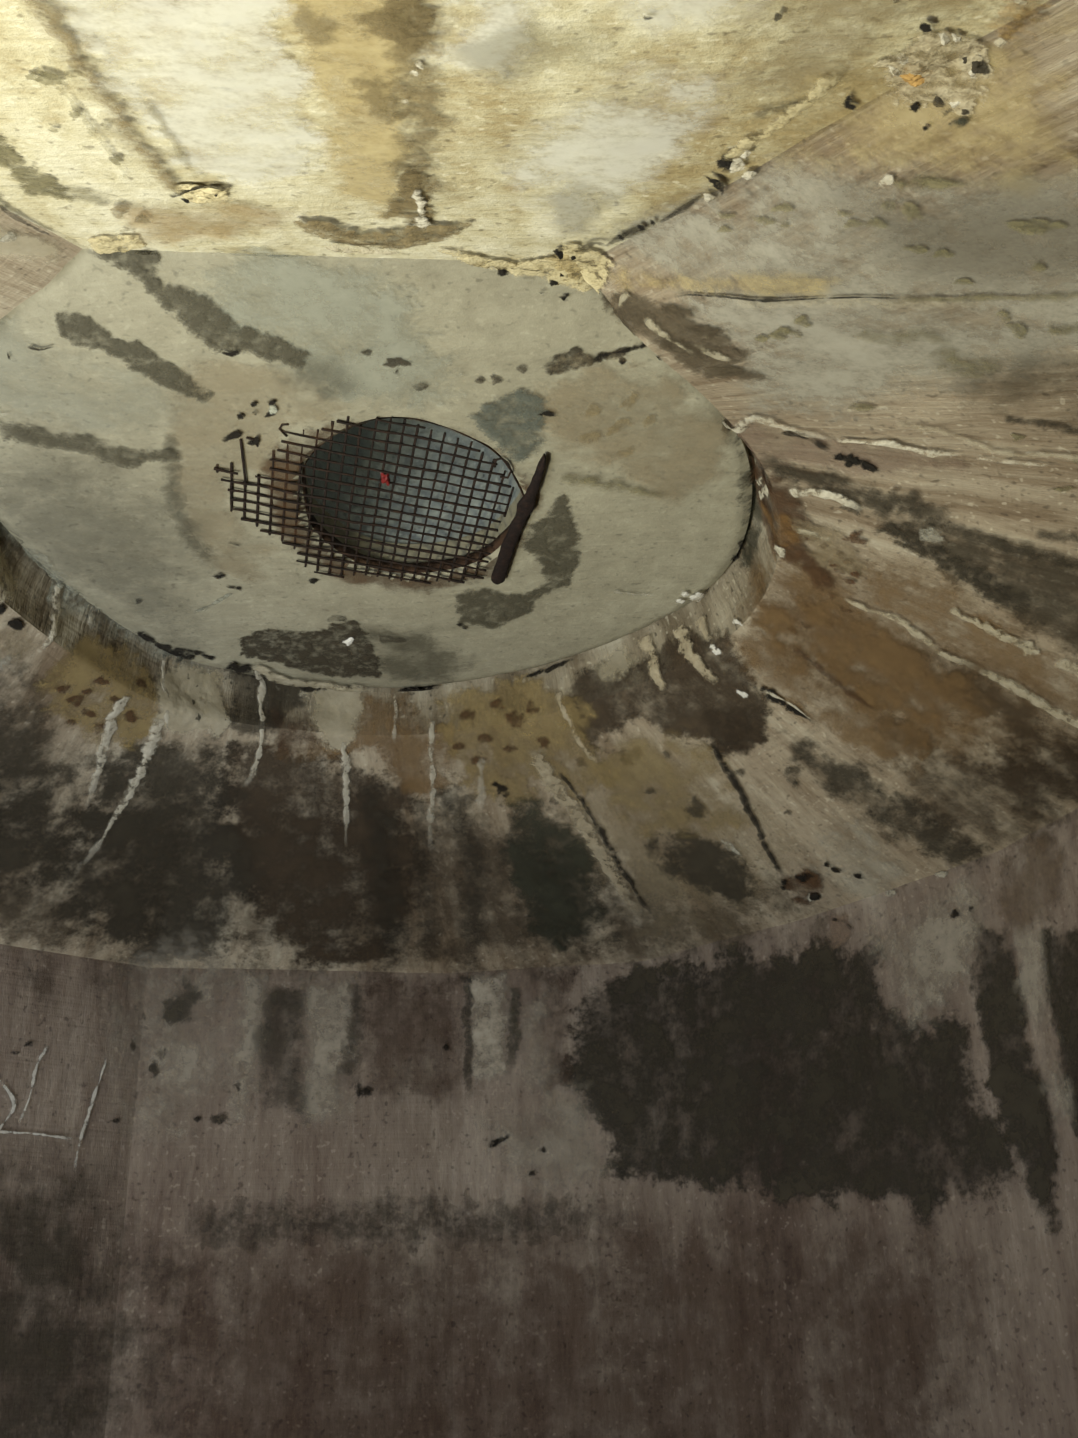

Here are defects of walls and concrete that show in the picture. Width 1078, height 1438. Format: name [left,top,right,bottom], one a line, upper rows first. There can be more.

corrosion [277,0,409,204]
damp [358,0,445,230]
crack [582,80,837,252]
spalling [873,0,1042,131]
damp [55,314,213,402]
spalling [223,401,277,446]
damp [94,250,441,401]
damp [602,169,1078,411]
damp [456,495,580,629]
damp [770,460,1078,654]
crack [713,747,781,871]
damp [0,583,1078,1233]